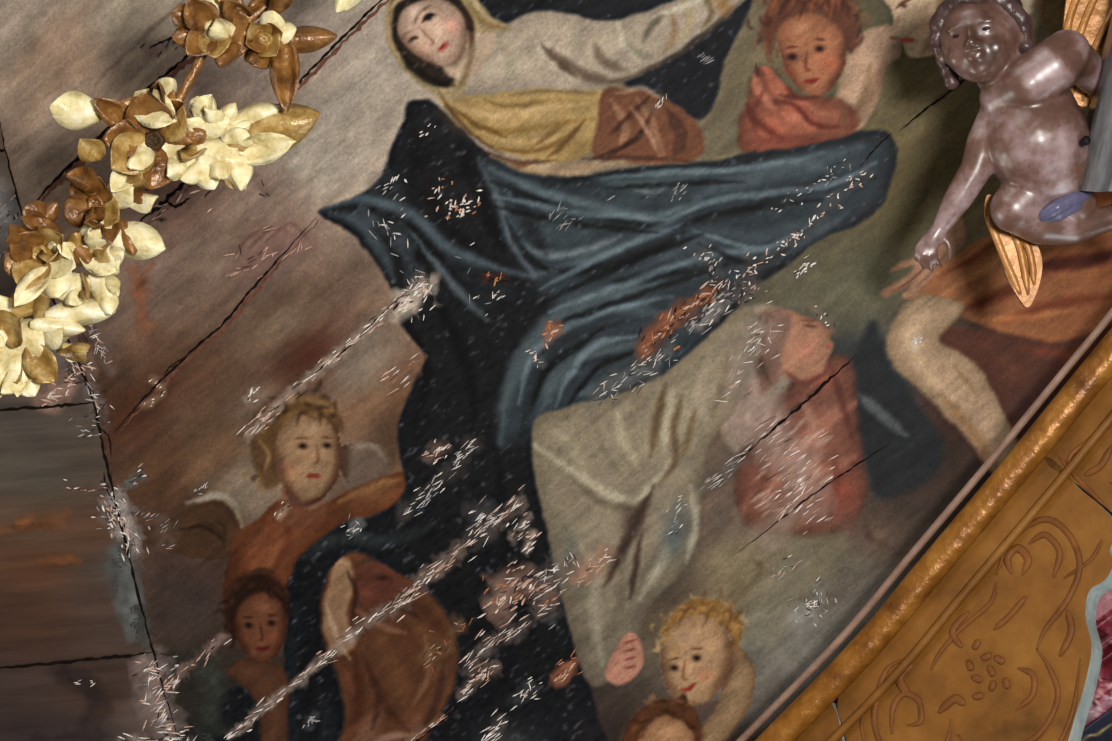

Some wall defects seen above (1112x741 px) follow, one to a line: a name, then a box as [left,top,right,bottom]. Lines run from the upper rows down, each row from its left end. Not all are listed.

crack [140,182,200,225]
peeling [367,159,408,257]
peeling [592,150,873,406]
peeling [35,325,114,437]
peeling [235,266,435,436]
crack [737,354,857,462]
peeling [63,463,179,562]
crack [0,216,321,741]
peeling [403,438,479,516]
crack [739,445,887,552]
peeling [224,484,616,741]
peeling [117,636,232,741]